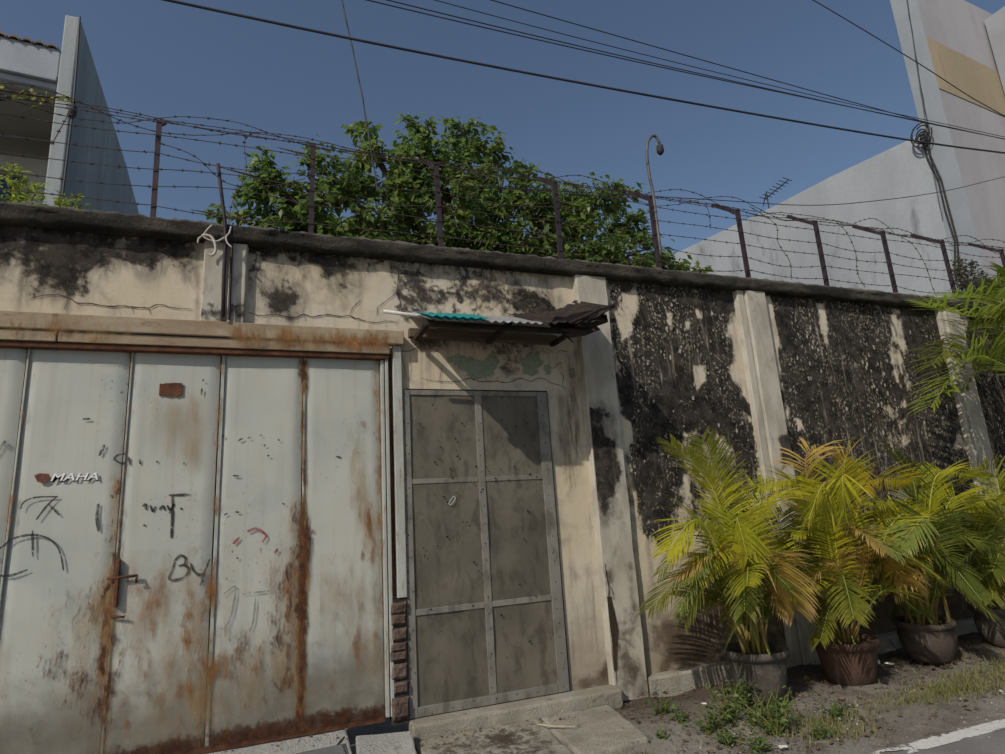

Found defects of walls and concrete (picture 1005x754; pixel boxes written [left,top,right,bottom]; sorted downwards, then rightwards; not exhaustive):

damp [0,224,194,297]
crack [31,294,185,314]
damp [249,247,356,288]
corrosion [298,359,308,393]
corrosion [314,330,396,610]
damp [368,258,558,320]
peeling [447,352,500,380]
damp [589,280,764,548]
damp [765,294,975,535]
damp [966,313,1005,491]
corrosion [69,535,121,730]
corrosion [115,496,385,754]